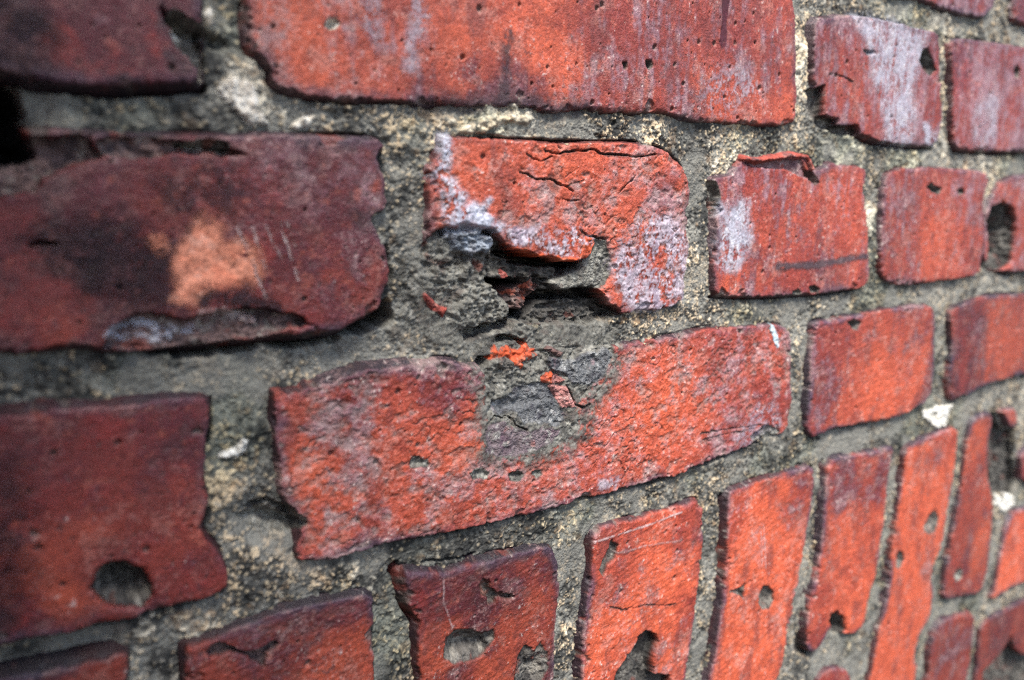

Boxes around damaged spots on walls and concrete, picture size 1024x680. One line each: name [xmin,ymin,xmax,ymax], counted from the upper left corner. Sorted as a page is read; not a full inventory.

leakage [433,136,593,255]
crack [522,148,647,187]
efflorescence [614,215,687,310]
spalling [103,308,305,349]
spalling [399,225,622,481]